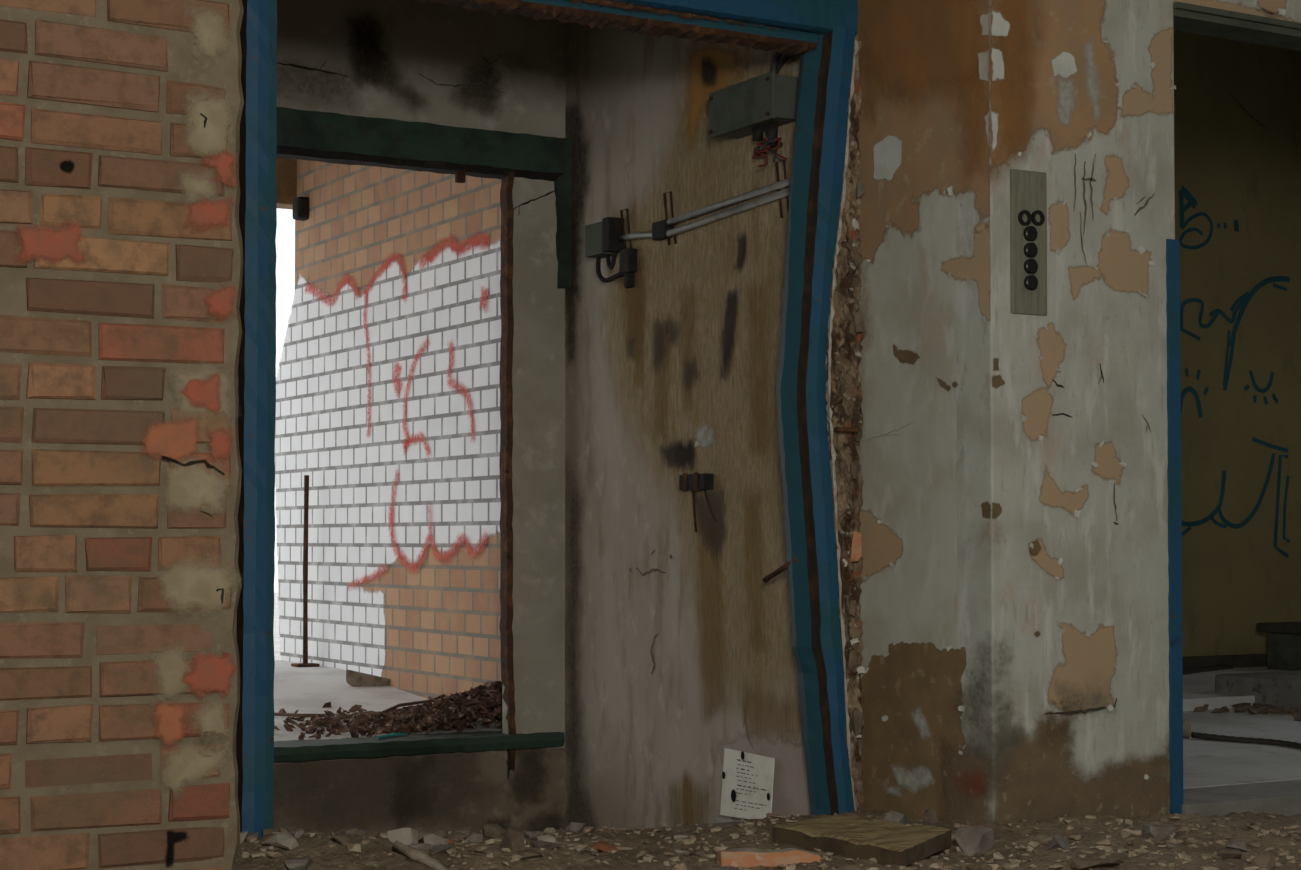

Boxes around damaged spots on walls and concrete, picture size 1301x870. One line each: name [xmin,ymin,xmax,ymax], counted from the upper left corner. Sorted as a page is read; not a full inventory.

corrosion [571,0,775,28]
peeling [1174,0,1301,23]
peeling [825,0,1176,820]
spalling [721,734,810,817]